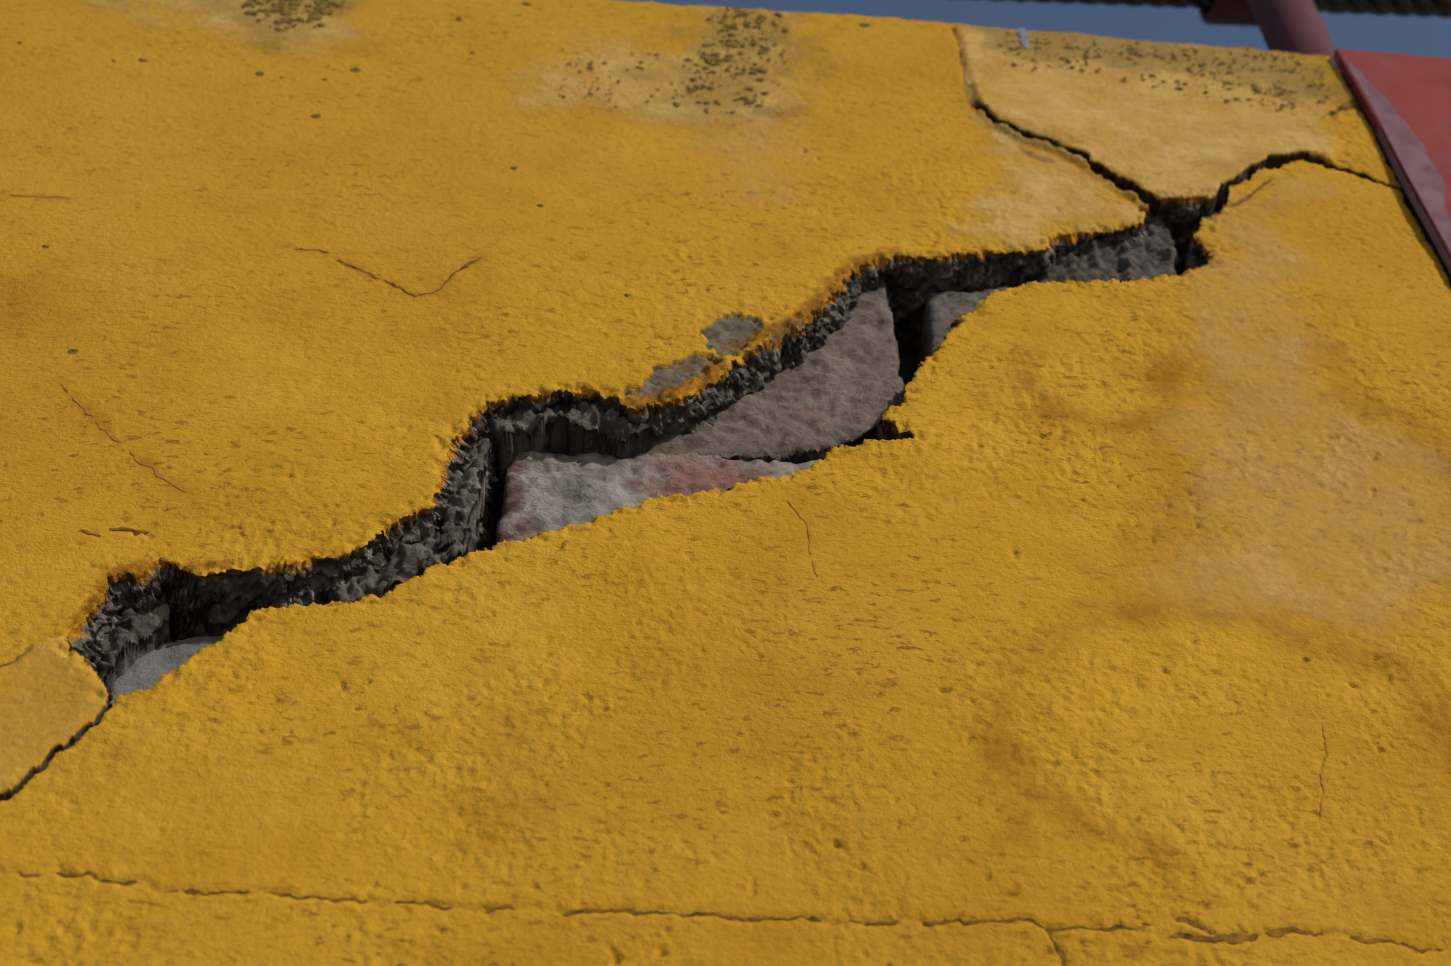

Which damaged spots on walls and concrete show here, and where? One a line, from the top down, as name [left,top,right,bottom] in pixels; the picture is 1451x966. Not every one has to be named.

crack [951,28,1160,218]
flaking render [1335,98,1364,113]
crack [3,192,71,200]
crack [1208,151,1402,218]
crack [296,248,482,297]
flaking render [63,25,1326,709]
crack [62,384,186,492]
crack [0,644,33,666]
crack [0,695,110,801]
crack [3,871,516,913]
crack [562,908,1443,966]